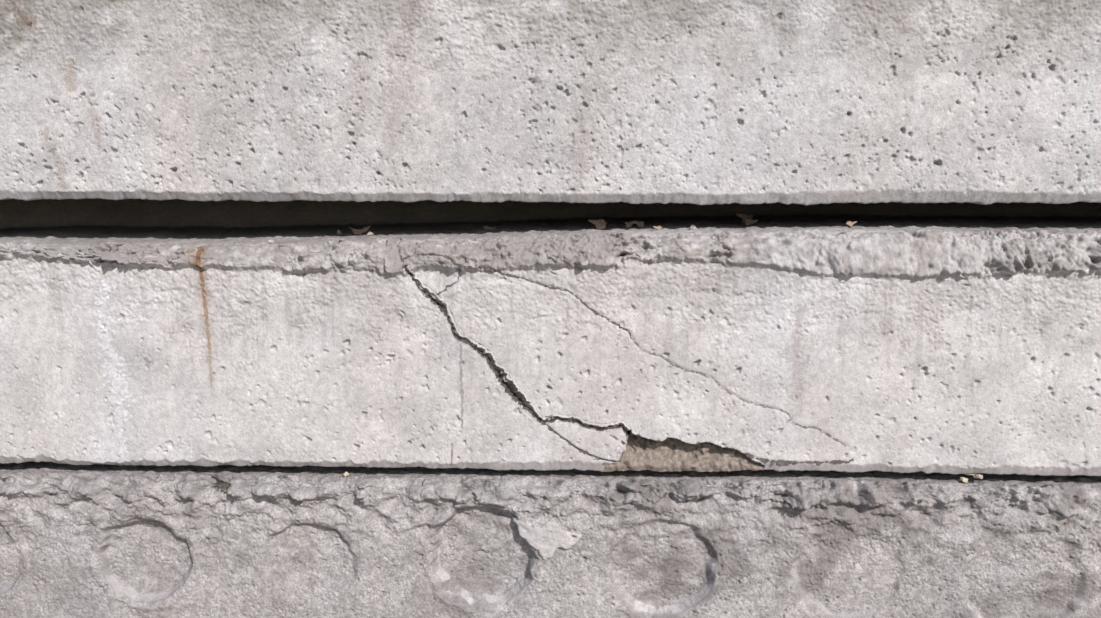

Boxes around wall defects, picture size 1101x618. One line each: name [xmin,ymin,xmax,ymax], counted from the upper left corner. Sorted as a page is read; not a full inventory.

corrosion [194,248,210,343]
crack [398,238,854,465]
spalling [0,422,1101,520]